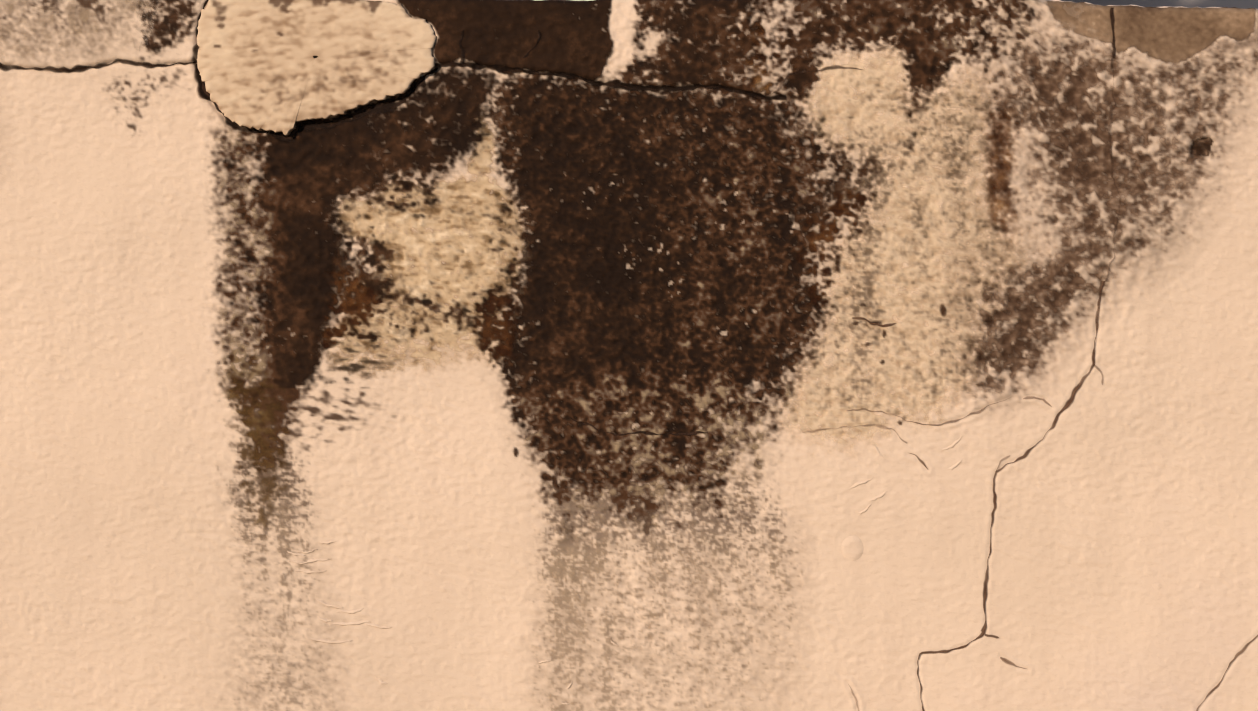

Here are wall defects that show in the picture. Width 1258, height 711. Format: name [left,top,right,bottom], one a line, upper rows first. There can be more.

peeling [197,0,437,135]
crack [0,0,863,142]
crack [1108,8,1116,58]
spalling [1047,0,1255,64]
damp [212,0,1258,587]
crack [848,410,982,469]
crack [917,281,1105,711]
crack [1196,635,1258,711]